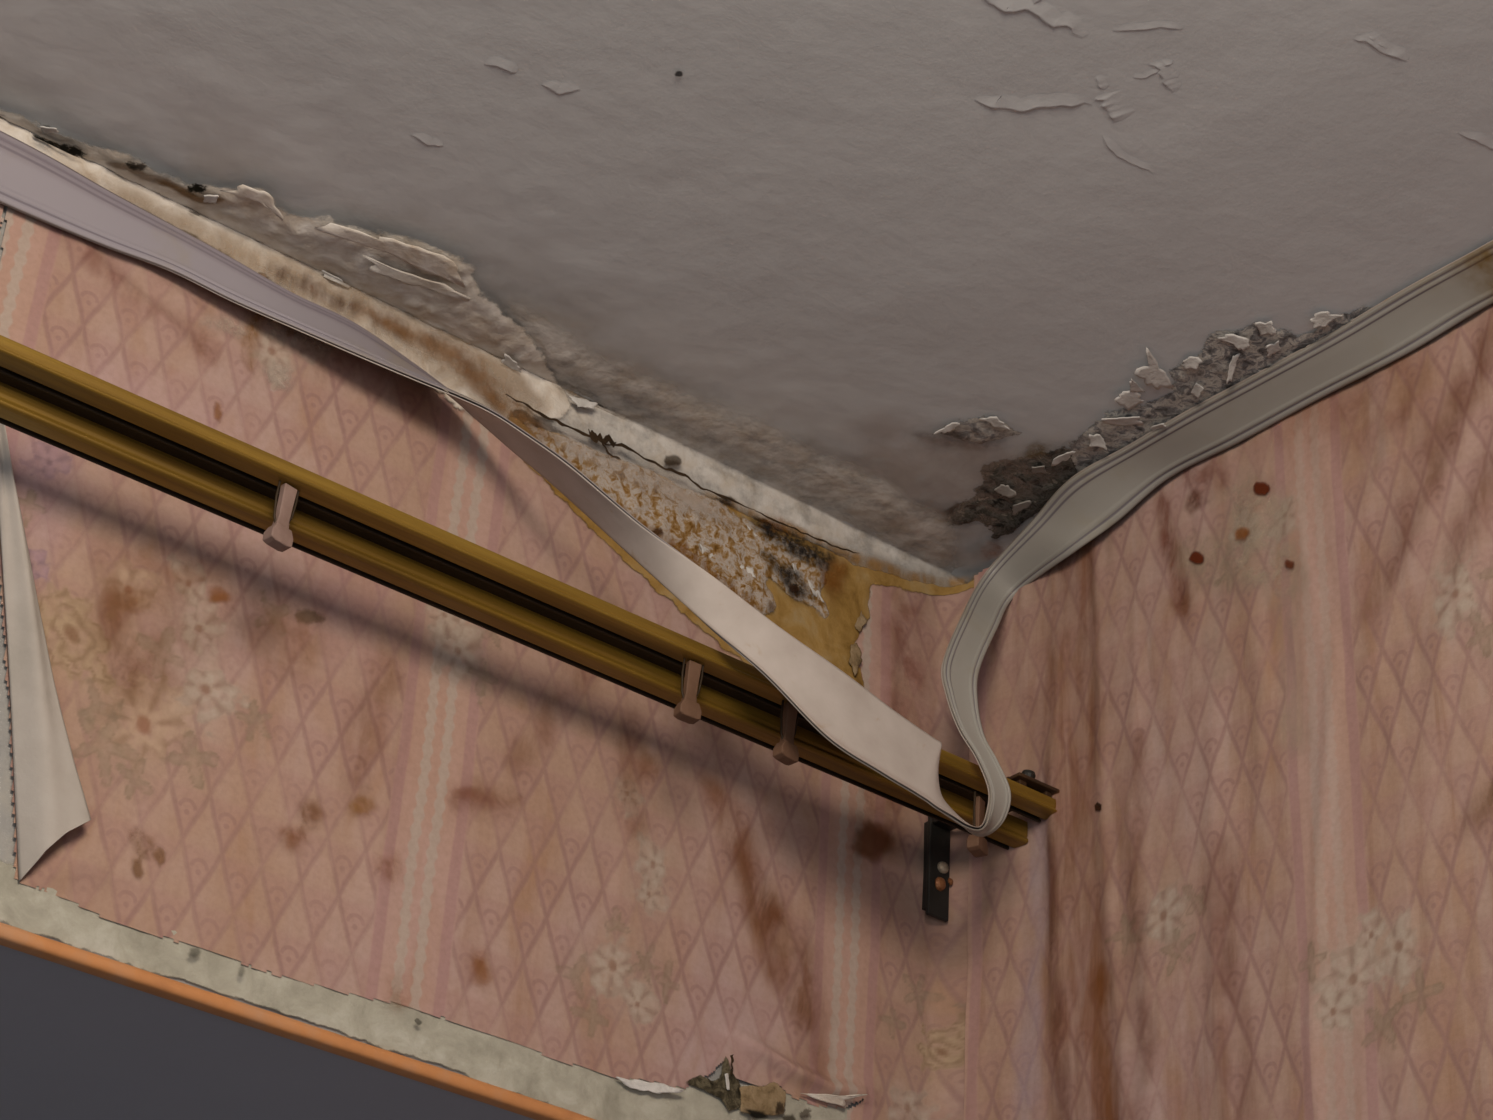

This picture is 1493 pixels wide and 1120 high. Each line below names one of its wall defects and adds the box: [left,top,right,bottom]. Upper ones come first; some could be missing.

peeling [0,109,1371,687]
leakage [664,455,682,465]
leakage [647,527,735,593]
leakage [753,516,842,597]
peeling [0,423,868,1120]
leakage [856,823,890,859]